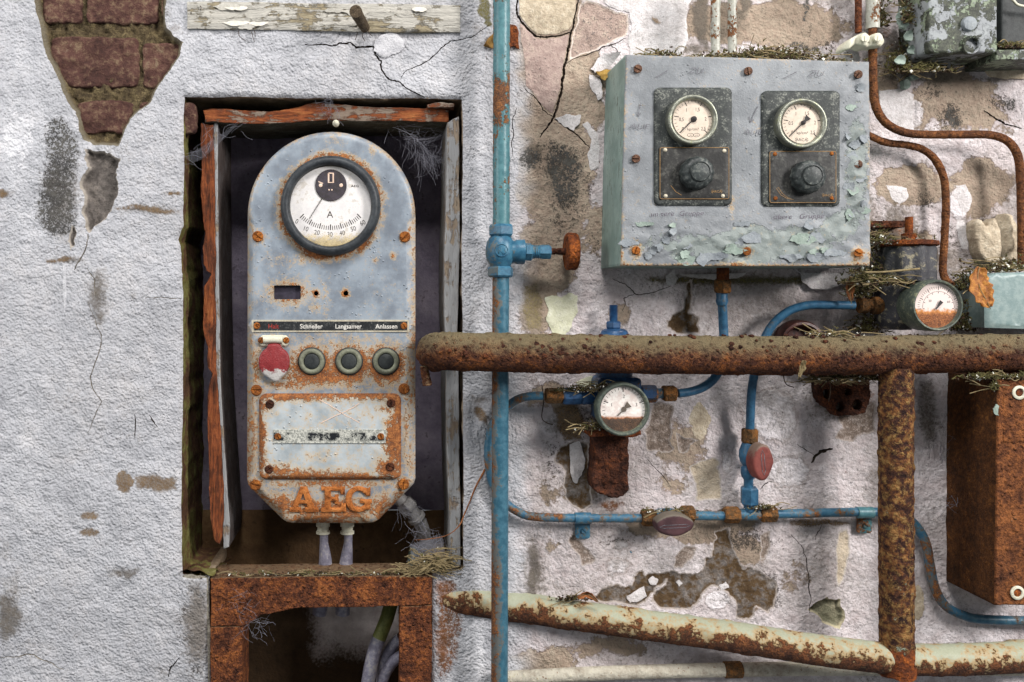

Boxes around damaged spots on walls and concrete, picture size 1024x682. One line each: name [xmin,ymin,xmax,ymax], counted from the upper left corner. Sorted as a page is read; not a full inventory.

spalling [34,0,183,250]
spalling [184,102,198,136]
crack [305,25,489,97]
crack [511,0,625,156]
peeling [879,89,914,130]
leakage [35,116,80,236]
leakage [519,140,584,208]
peeling [886,185,909,204]
crack [74,234,102,433]
peeling [545,293,578,334]
crack [797,444,833,463]
peeling [594,525,778,621]